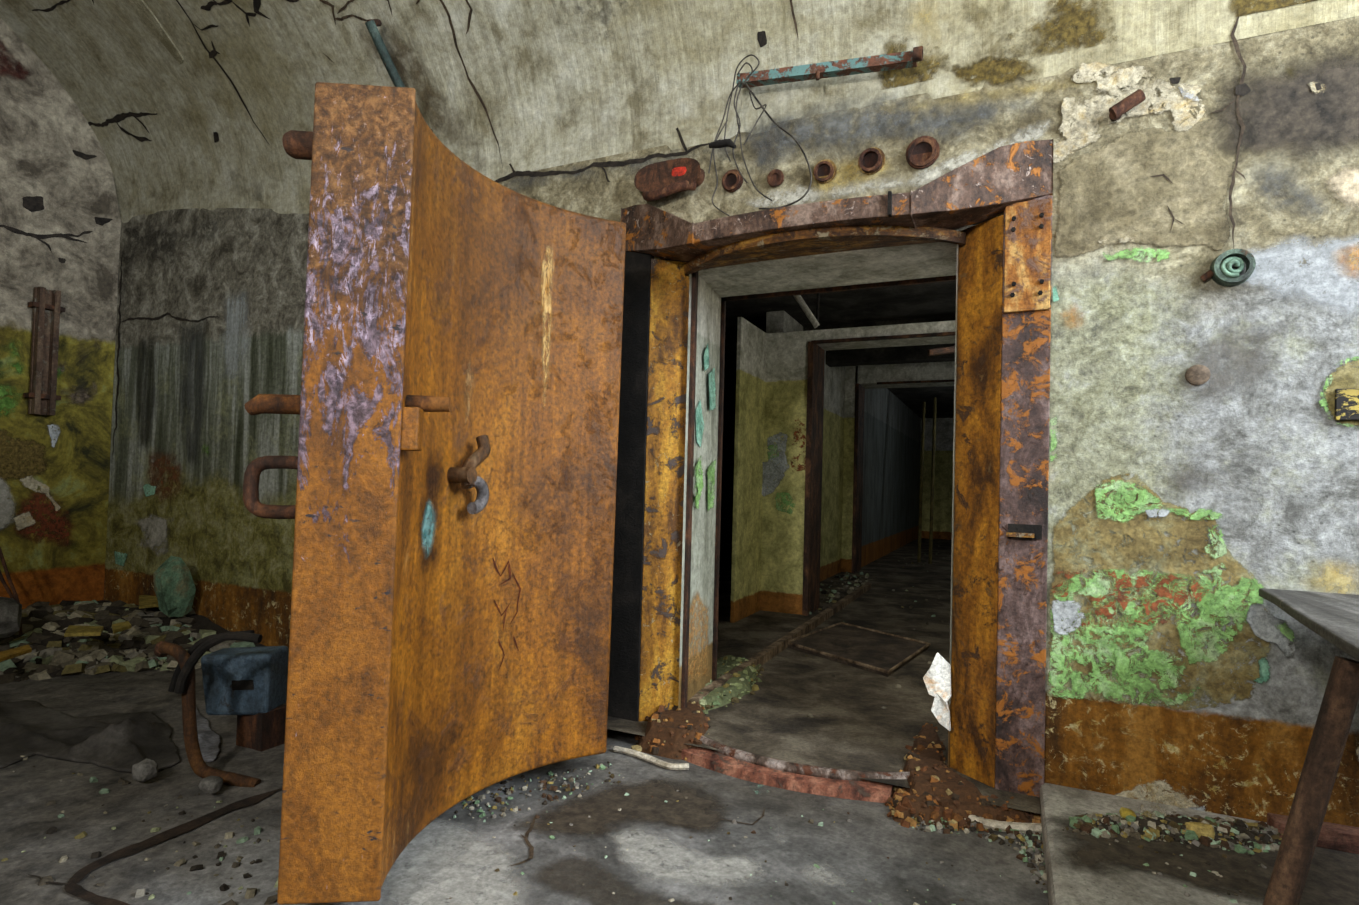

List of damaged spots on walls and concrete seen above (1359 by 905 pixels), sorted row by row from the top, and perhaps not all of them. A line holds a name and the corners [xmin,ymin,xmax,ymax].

crack [88,112,157,142]
crack [176,0,720,183]
peeling [1053,61,1206,166]
crack [1210,16,1247,249]
rust [818,164,885,191]
crack [0,225,93,253]
crack [112,252,218,455]
peeling [1318,356,1359,428]
peeling [48,424,60,448]
flaking render [0,478,14,529]
peeling [1047,473,1298,710]
rust [688,594,708,678]